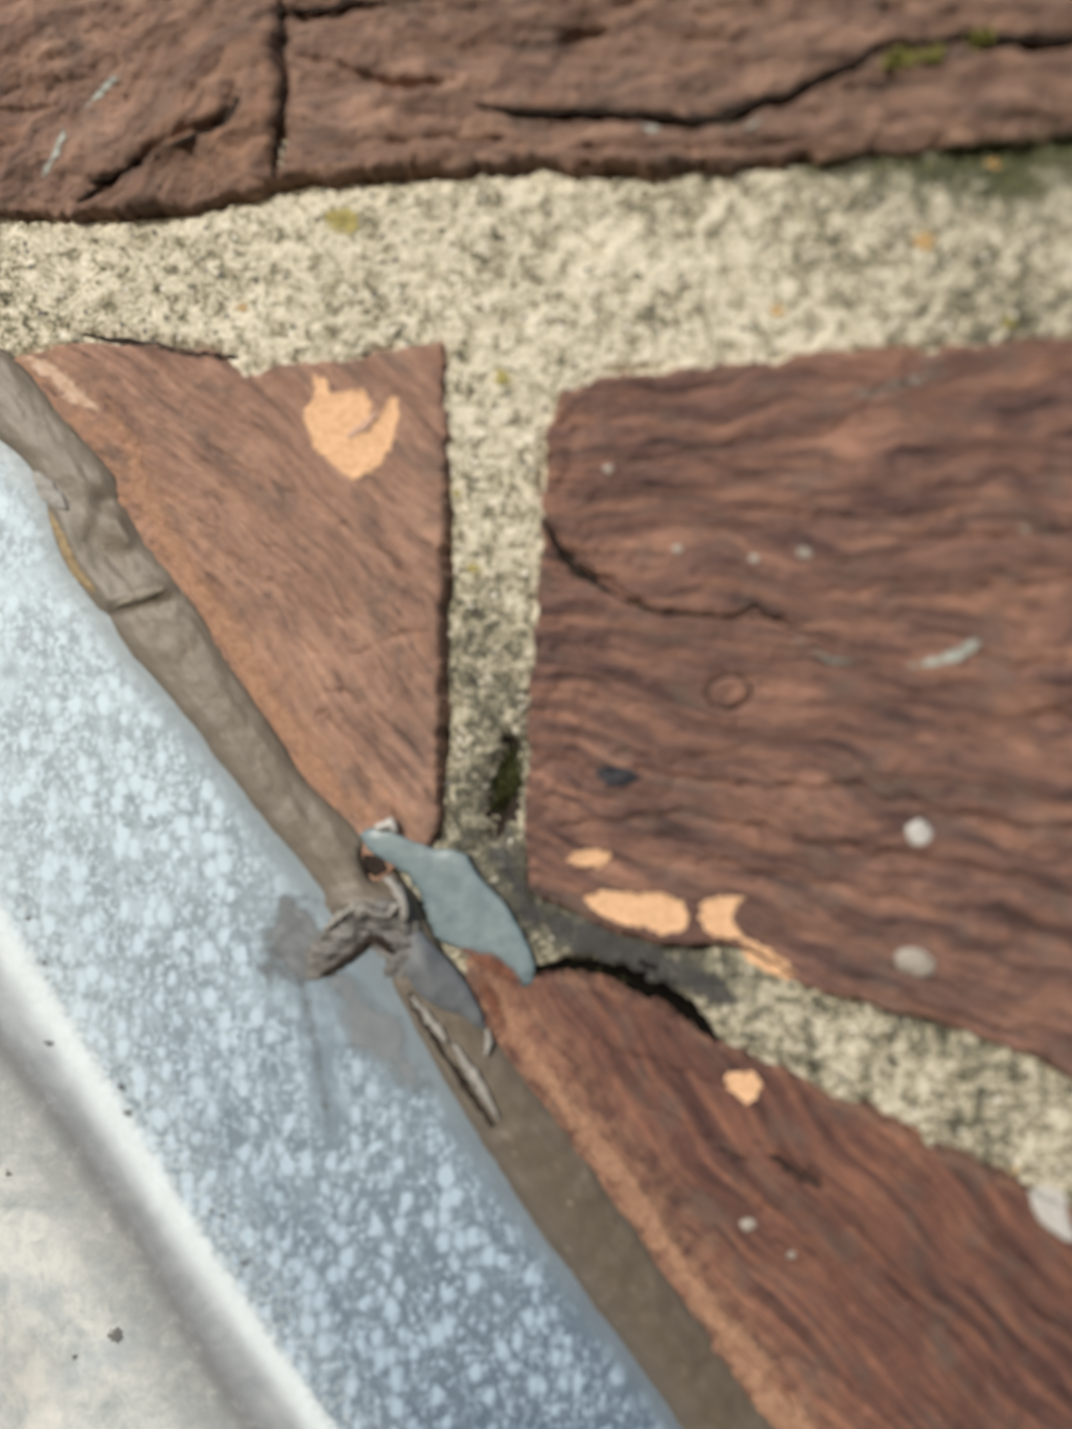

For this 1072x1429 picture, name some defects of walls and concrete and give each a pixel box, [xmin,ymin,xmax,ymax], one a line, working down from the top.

crack [270,0,418,176]
crack [476,31,1072,124]
crack [76,88,241,202]
spalling [303,375,401,480]
spalling [566,848,612,870]
spalling [584,889,796,981]
crack [535,956,718,1041]